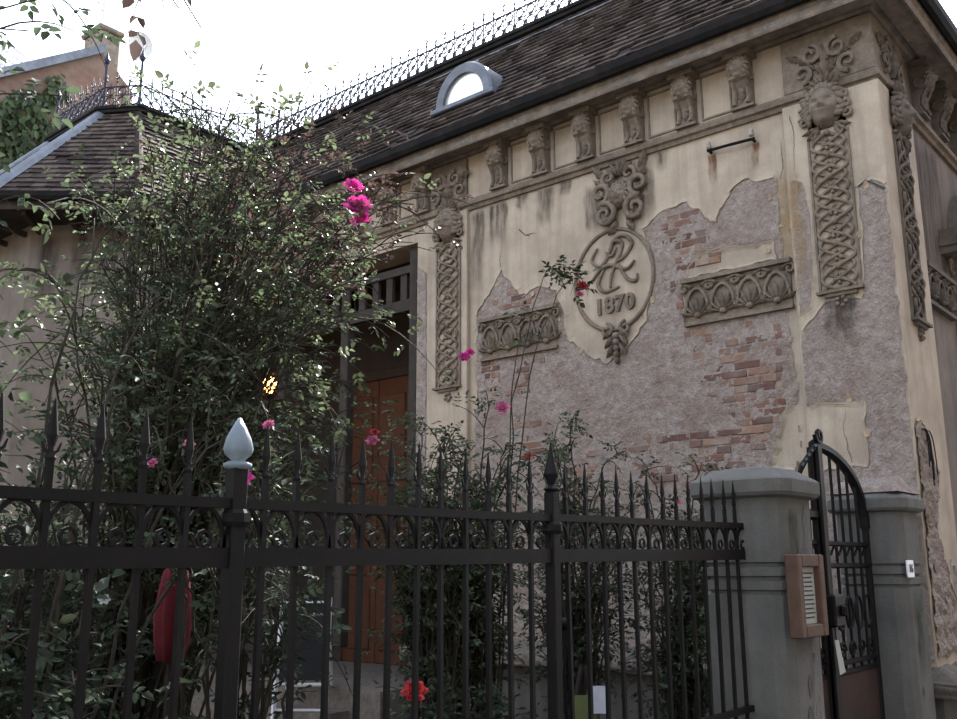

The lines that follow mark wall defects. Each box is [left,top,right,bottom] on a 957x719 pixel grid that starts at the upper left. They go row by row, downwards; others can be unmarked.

flaking render [472,172,957,663]